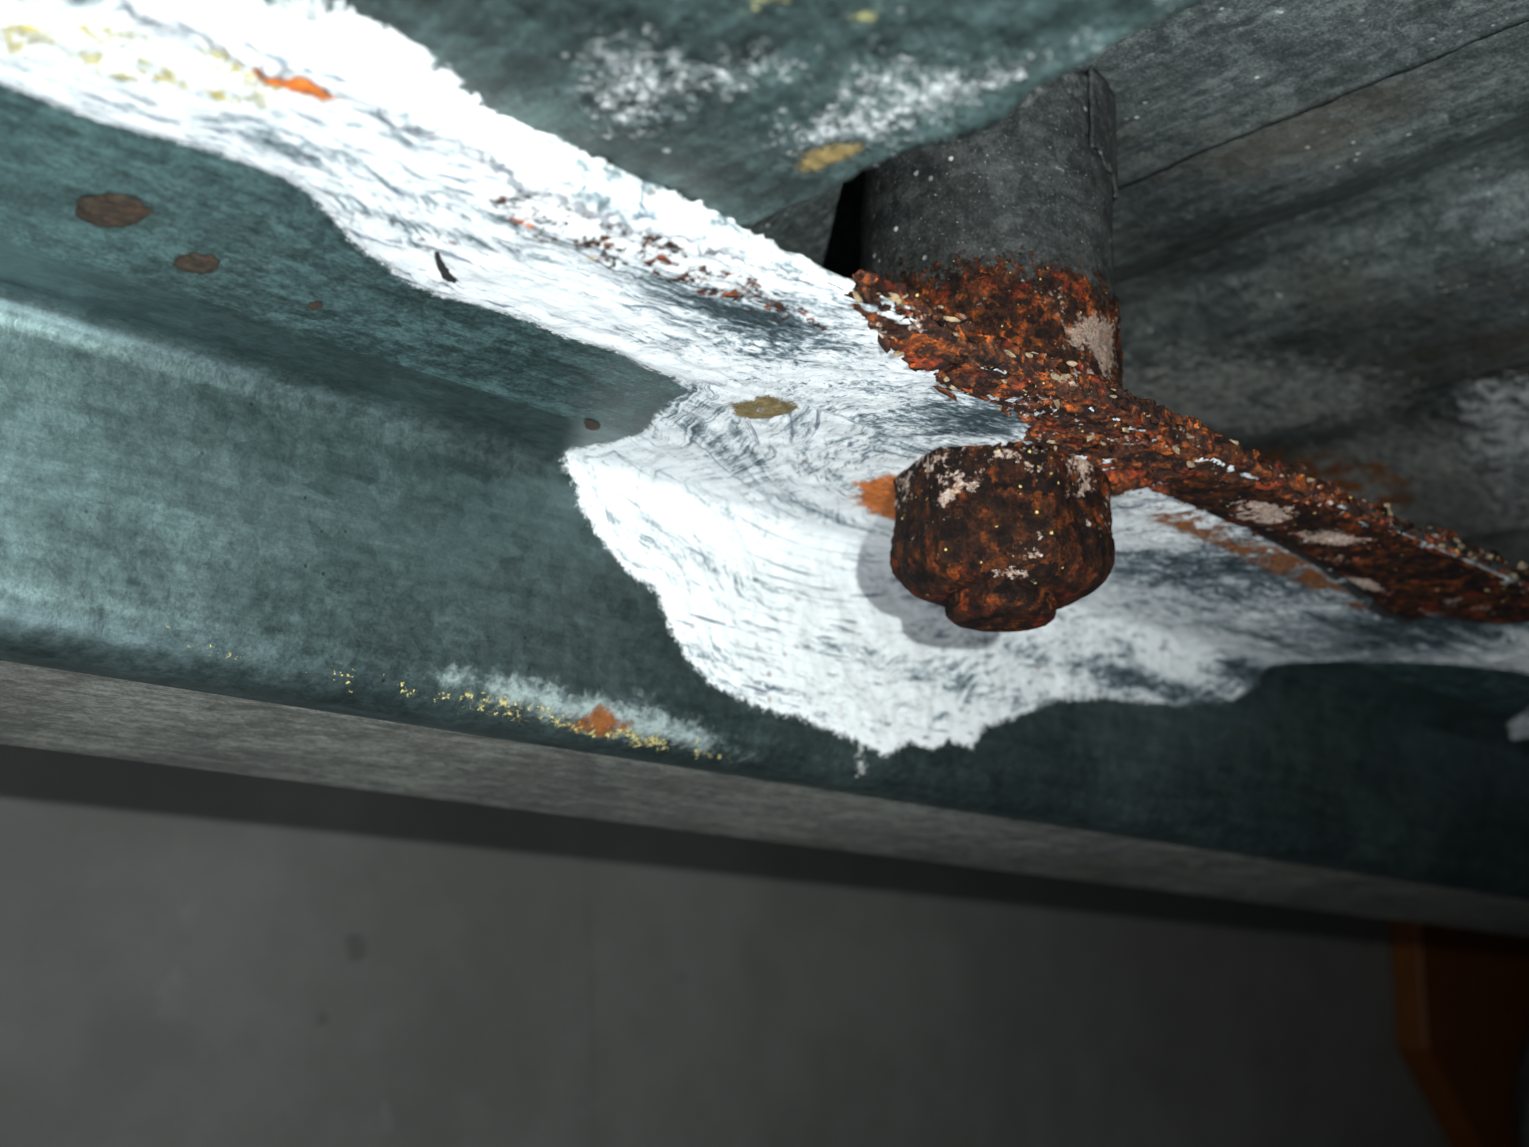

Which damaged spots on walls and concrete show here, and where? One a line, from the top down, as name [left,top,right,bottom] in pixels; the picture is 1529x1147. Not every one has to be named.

damp [0,22,283,111]
damp [592,55,764,121]
damp [810,65,1024,146]
rust [0,0,1529,757]
damp [731,395,799,419]
damp [434,688,729,759]